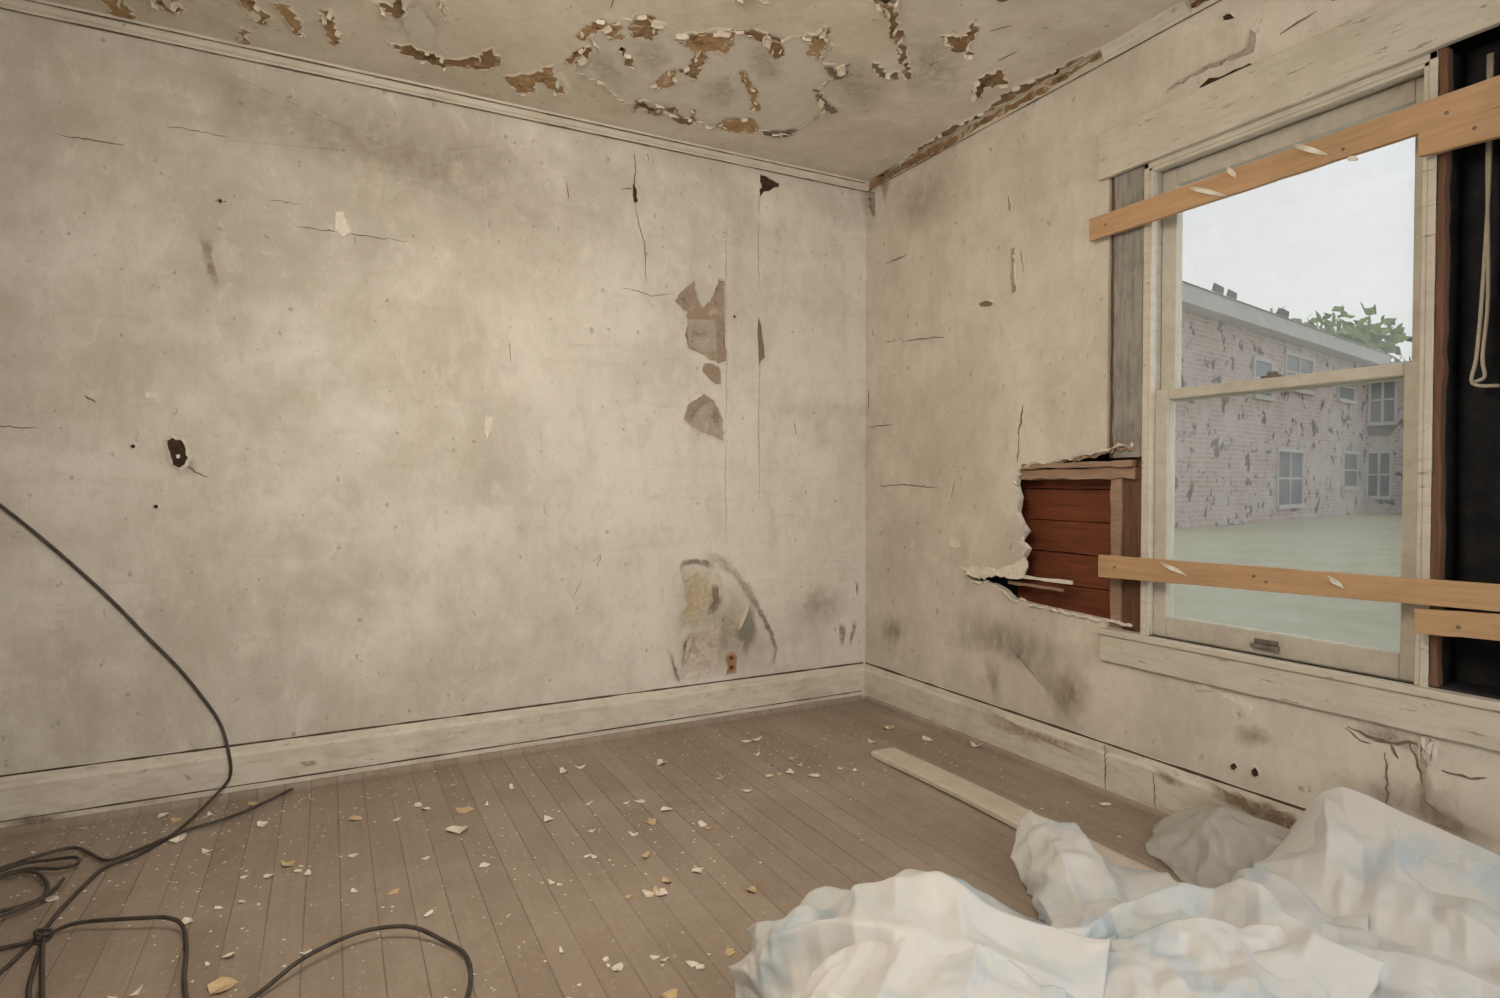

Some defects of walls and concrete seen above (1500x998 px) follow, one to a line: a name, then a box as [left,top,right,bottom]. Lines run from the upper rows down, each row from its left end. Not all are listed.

peeling [97,0,189,27]
peeling [232,0,345,48]
peeling [372,0,915,138]
peeling [937,18,1011,103]
peeling [1180,0,1208,8]
peeling [1166,11,1260,93]
crack [622,153,671,296]
spalling [672,278,729,443]
spalling [163,434,207,477]
spalling [961,442,1142,632]